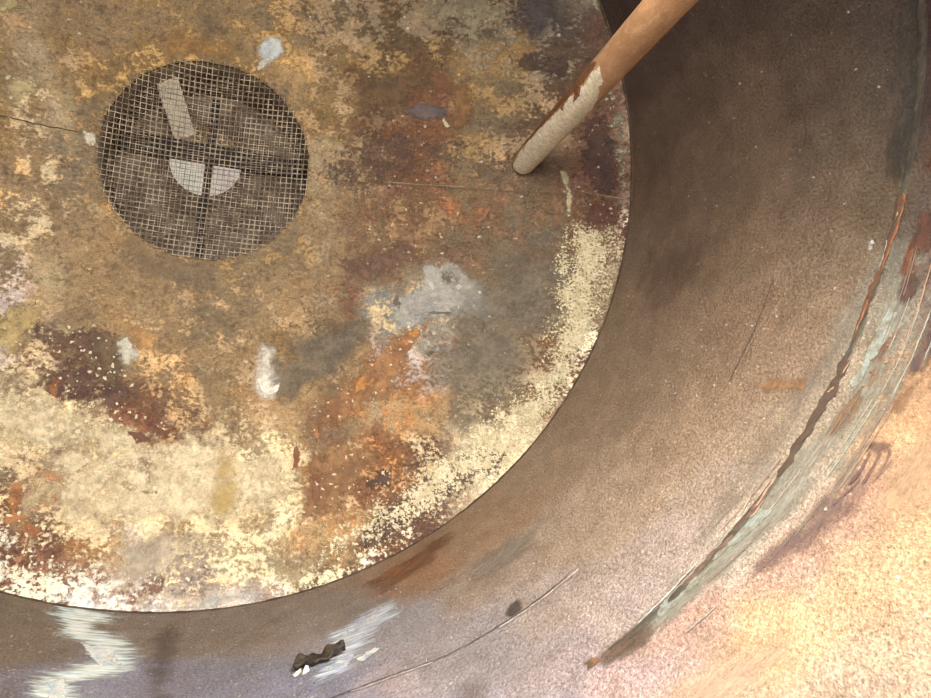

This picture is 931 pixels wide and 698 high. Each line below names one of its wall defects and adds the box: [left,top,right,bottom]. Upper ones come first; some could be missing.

crack [0,115,81,135]
rust [317,120,470,258]
rust [898,211,931,303]
peeling [0,300,46,356]
rust [30,319,178,443]
spalling [87,328,139,388]
peeling [0,366,289,550]
rust [292,321,430,524]
peeling [290,171,626,587]
rust [827,330,899,434]
rust [0,480,192,605]
spalling [506,600,521,616]